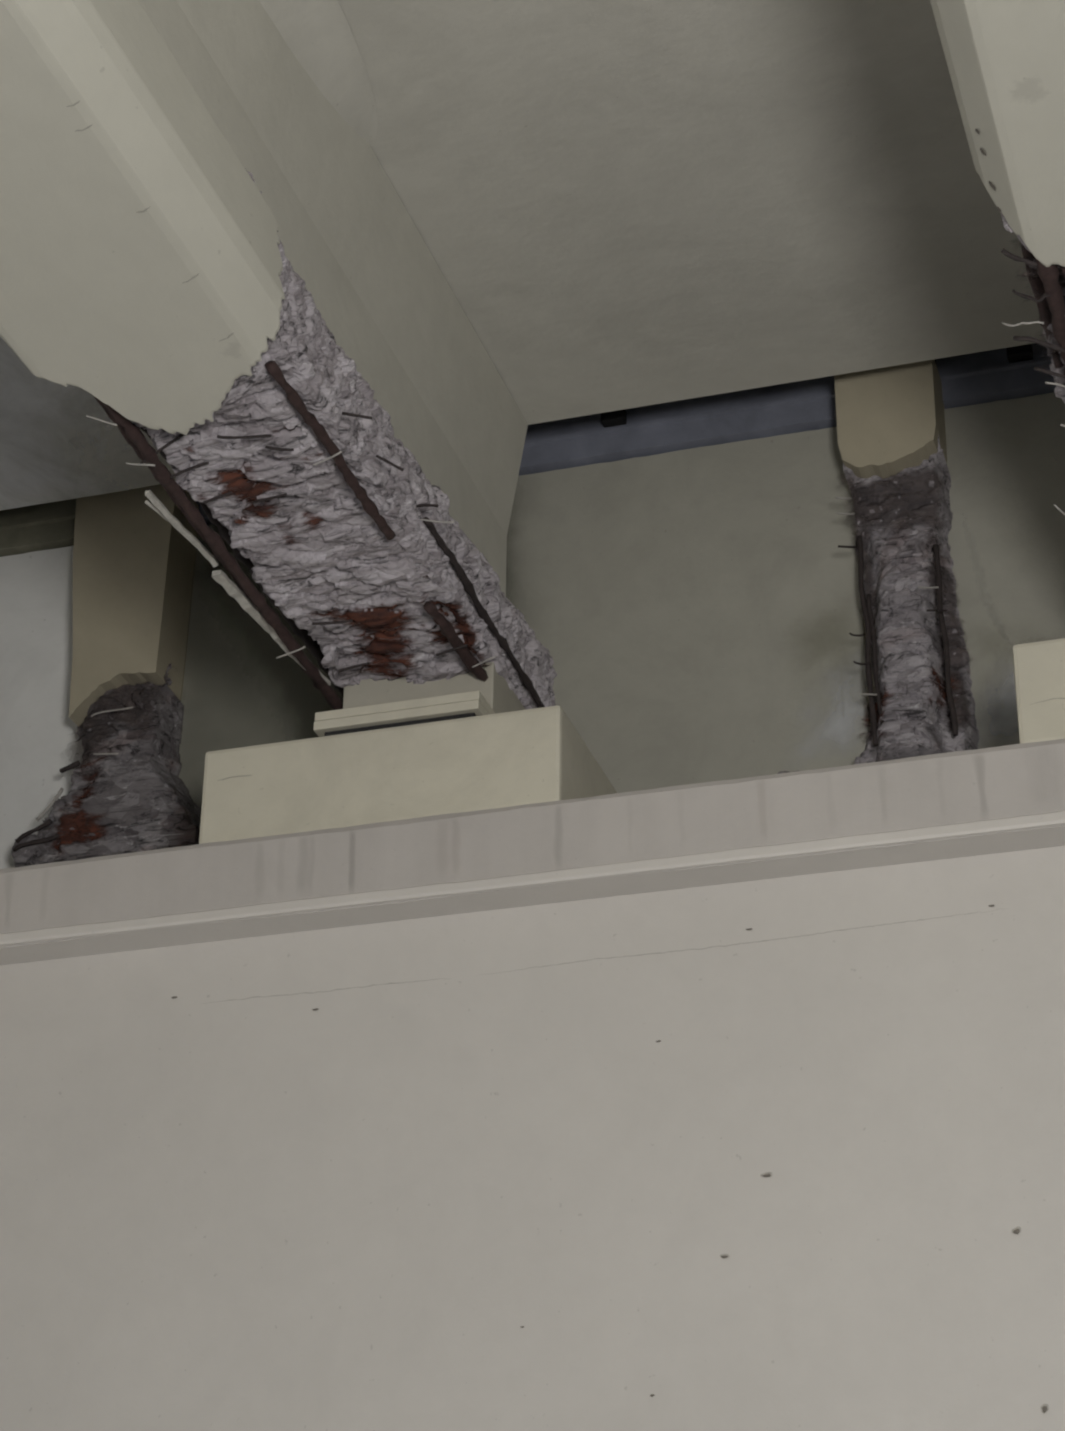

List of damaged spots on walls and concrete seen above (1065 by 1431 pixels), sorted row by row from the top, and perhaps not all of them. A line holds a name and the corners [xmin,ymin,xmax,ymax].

spalling [989,181,1065,403]
spalling [86,233,557,710]
spalling [836,436,979,764]
spalling [11,663,201,867]